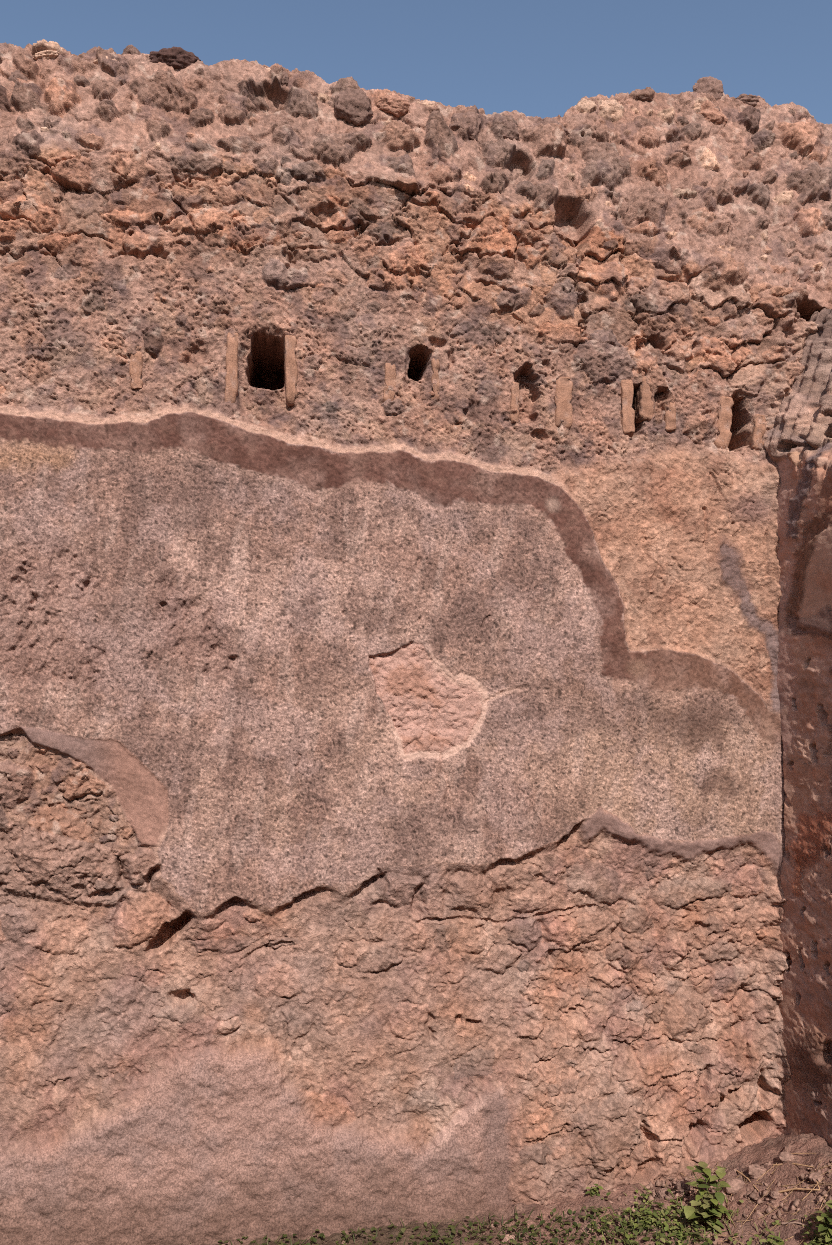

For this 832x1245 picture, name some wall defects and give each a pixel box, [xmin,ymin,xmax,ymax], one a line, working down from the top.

flaking render [0,447,832,1206]
crack [439,753,457,812]